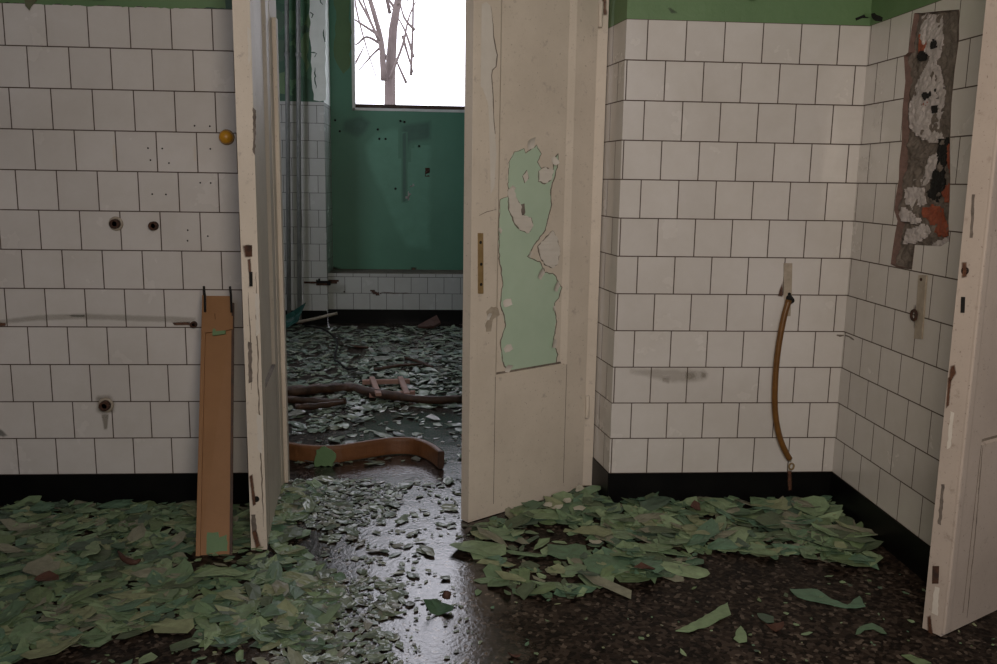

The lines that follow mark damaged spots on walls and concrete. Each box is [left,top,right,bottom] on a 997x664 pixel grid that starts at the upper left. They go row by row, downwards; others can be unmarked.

peeling [0,0,226,10]
peeling [481,2,562,373]
flaking render [891,10,959,269]